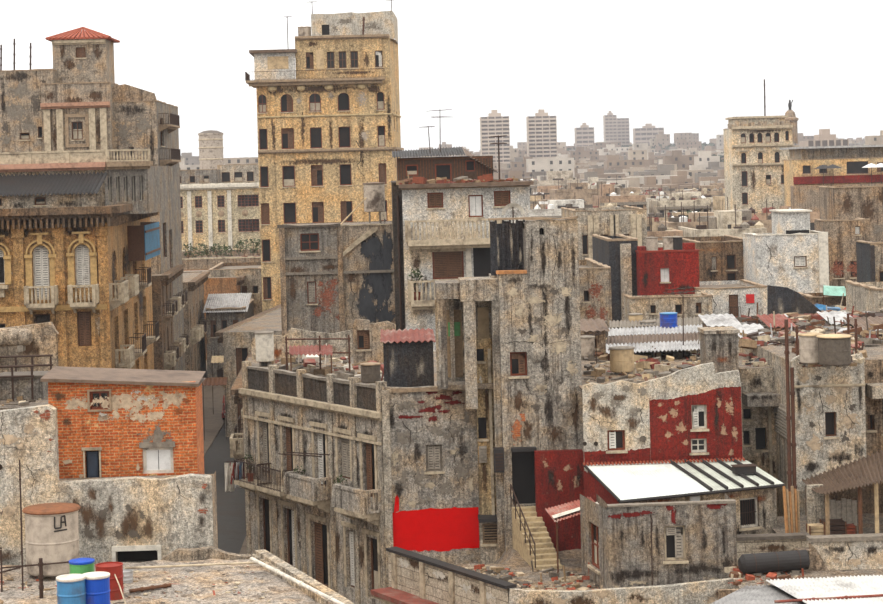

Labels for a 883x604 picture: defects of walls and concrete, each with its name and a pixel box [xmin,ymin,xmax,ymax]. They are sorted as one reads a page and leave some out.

leakage [0,72,31,110]
leakage [509,238,562,443]
peeling [60,396,92,410]
peeling [97,390,186,423]
leakage [572,394,626,429]
peeling [657,401,688,446]
peeling [717,397,738,456]
crack [818,392,857,456]
crack [0,412,42,505]
peeling [392,411,474,508]
leakage [73,488,113,539]
leakage [121,507,152,539]